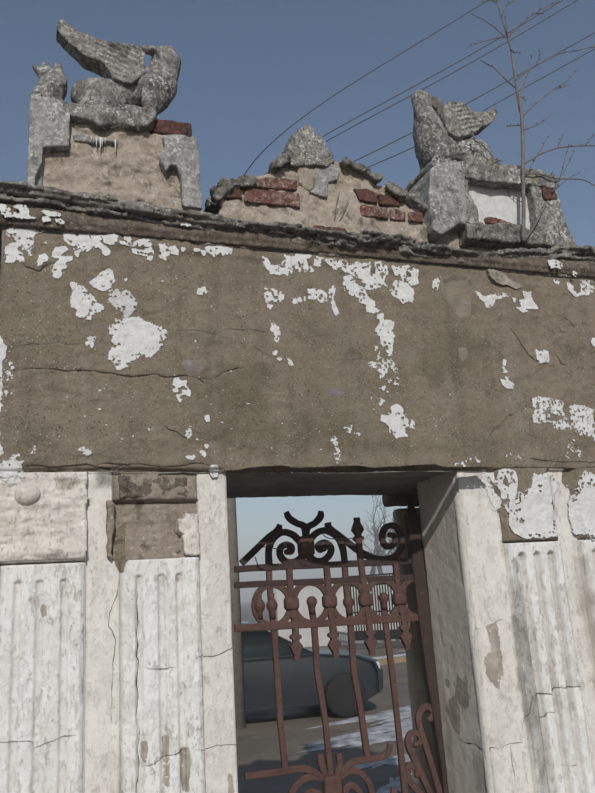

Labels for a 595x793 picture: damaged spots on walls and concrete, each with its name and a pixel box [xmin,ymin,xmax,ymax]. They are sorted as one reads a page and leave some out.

peeling [0,204,233,278]
peeling [0,336,14,412]
peeling [70,268,167,370]
crack [47,367,243,381]
peeling [262,254,419,439]
flaking render [432,269,538,318]
peeling [500,359,514,389]
peeling [0,434,25,486]
peeling [209,396,595,542]
peeling [484,623,504,689]
crack [136,610,243,785]
crack [457,686,581,775]